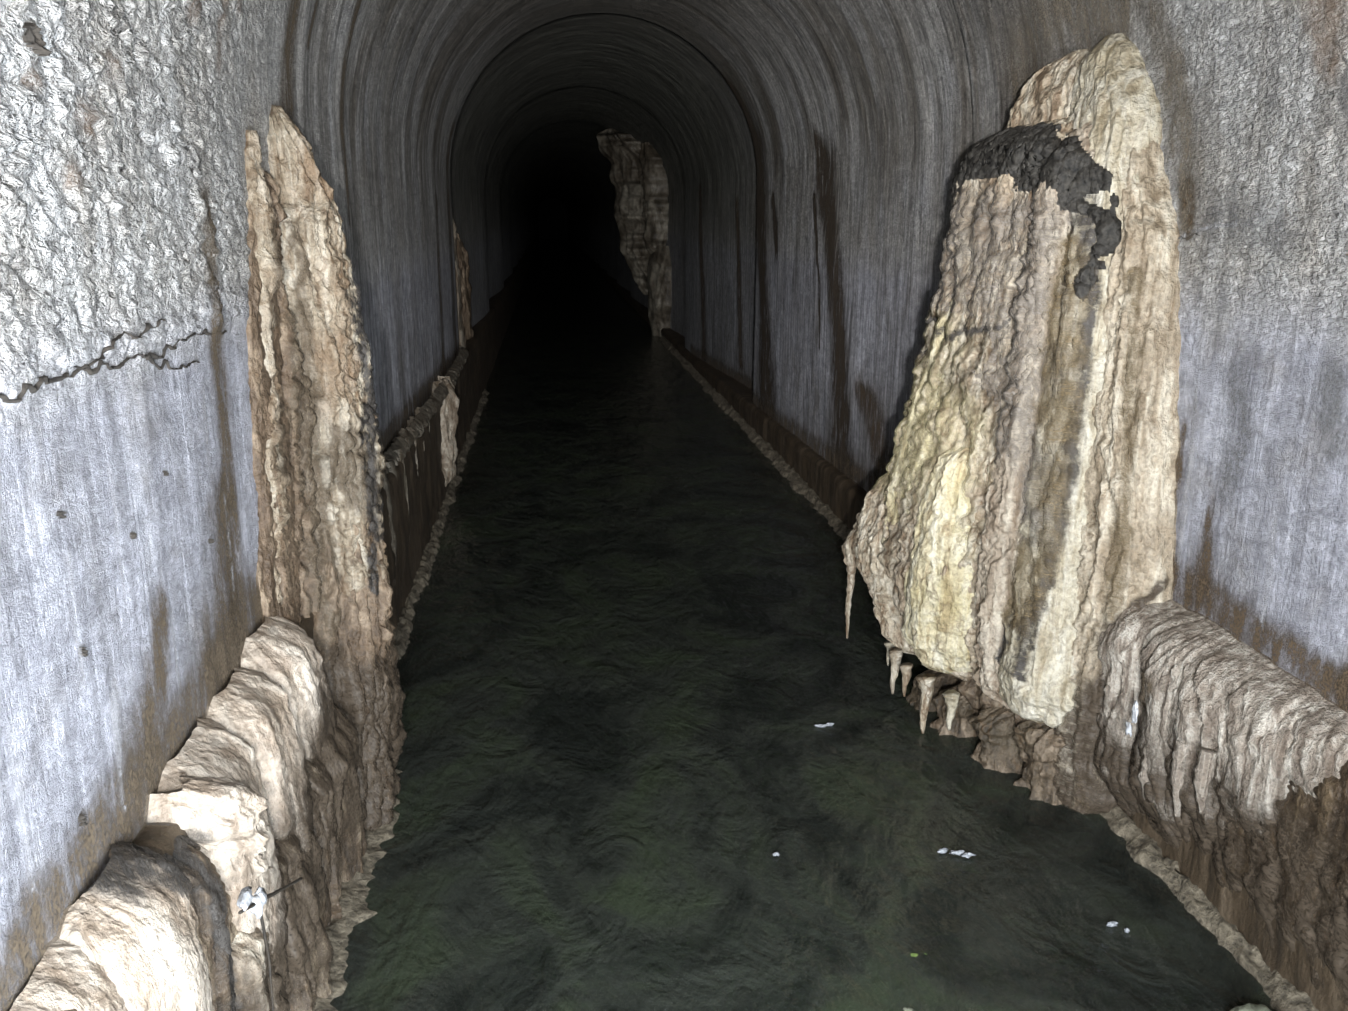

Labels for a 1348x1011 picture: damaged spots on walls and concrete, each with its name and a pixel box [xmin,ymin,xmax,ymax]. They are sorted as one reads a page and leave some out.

crack [0,319,227,403]
leakage [0,190,367,1011]
leakage [282,0,318,119]
leakage [340,0,362,225]
leakage [347,122,474,596]
leakage [596,128,672,337]
leakage [813,130,854,480]
leakage [842,0,1348,1005]